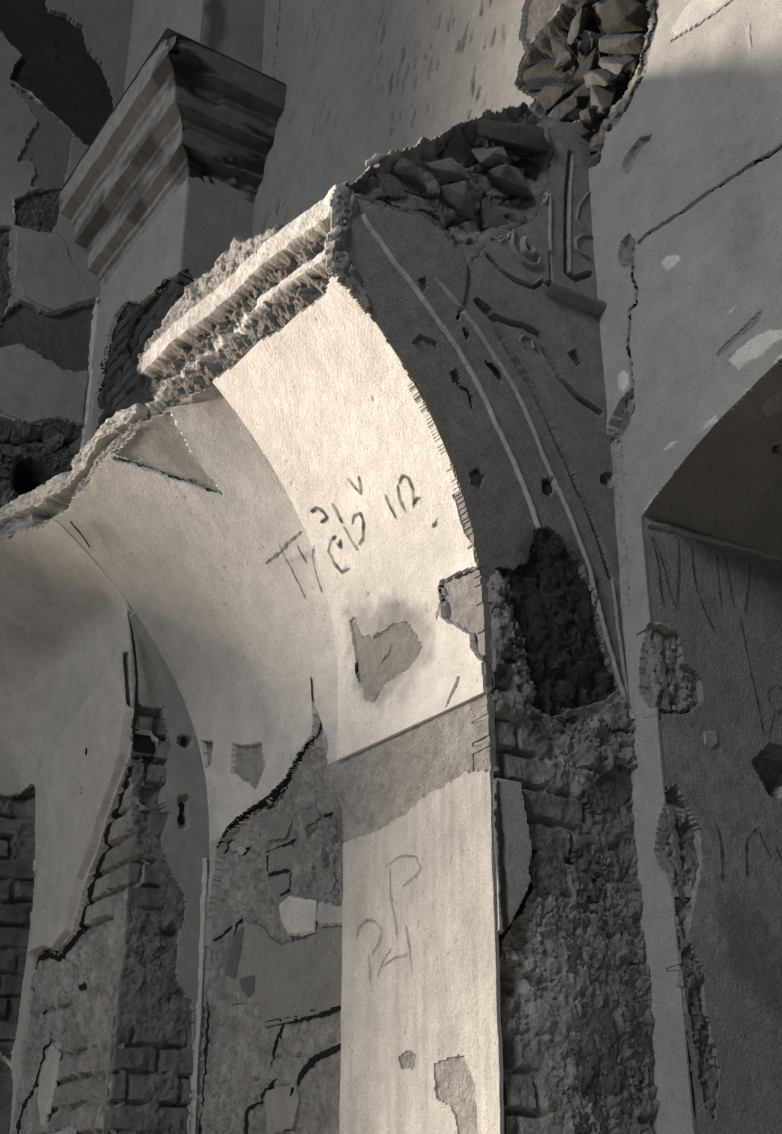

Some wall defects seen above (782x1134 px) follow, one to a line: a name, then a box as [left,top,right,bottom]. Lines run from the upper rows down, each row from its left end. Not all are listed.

flaking render [523,0,564,49]
crack [754,145,782,165]
spalling [0,0,370,542]
crack [626,208,690,380]
flaking render [645,621,698,720]
flaking render [0,528,660,1134]
crack [244,1006,341,1134]